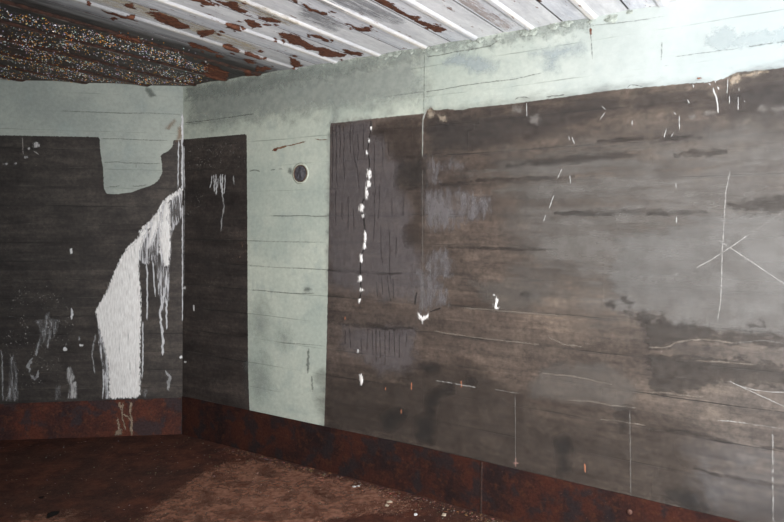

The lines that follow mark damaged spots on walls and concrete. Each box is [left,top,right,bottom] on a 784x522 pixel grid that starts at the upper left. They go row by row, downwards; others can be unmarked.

corrosion [102,0,364,81]
corrosion [374,0,446,33]
water stain [485,19,584,45]
water stain [186,49,419,122]
water stain [741,78,784,118]
water stain [210,174,234,228]
water stain [423,99,617,228]
water stain [92,114,186,436]
water stain [510,134,784,394]
corrosion [145,447,503,522]